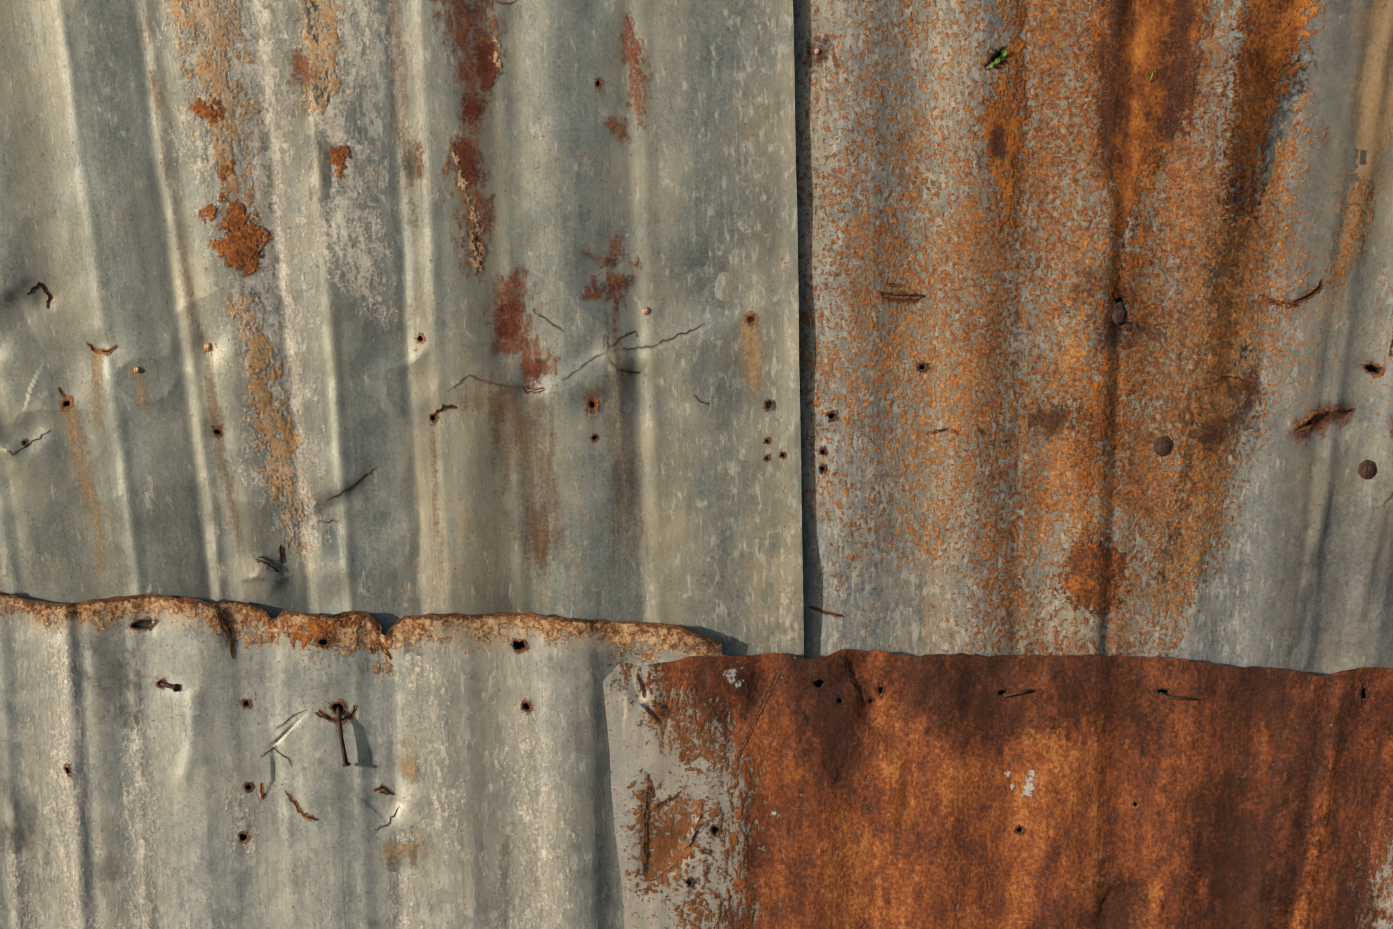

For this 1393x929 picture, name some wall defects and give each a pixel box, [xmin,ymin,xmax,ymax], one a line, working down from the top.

rust [796,27,854,44]
rust [606,15,646,140]
rust [433,0,501,274]
rust [795,117,830,160]
rust [476,268,560,561]
rust [1289,403,1353,438]
rust [678,742,693,767]
rust [621,769,721,901]
rust [722,830,739,864]
rust [669,873,709,929]